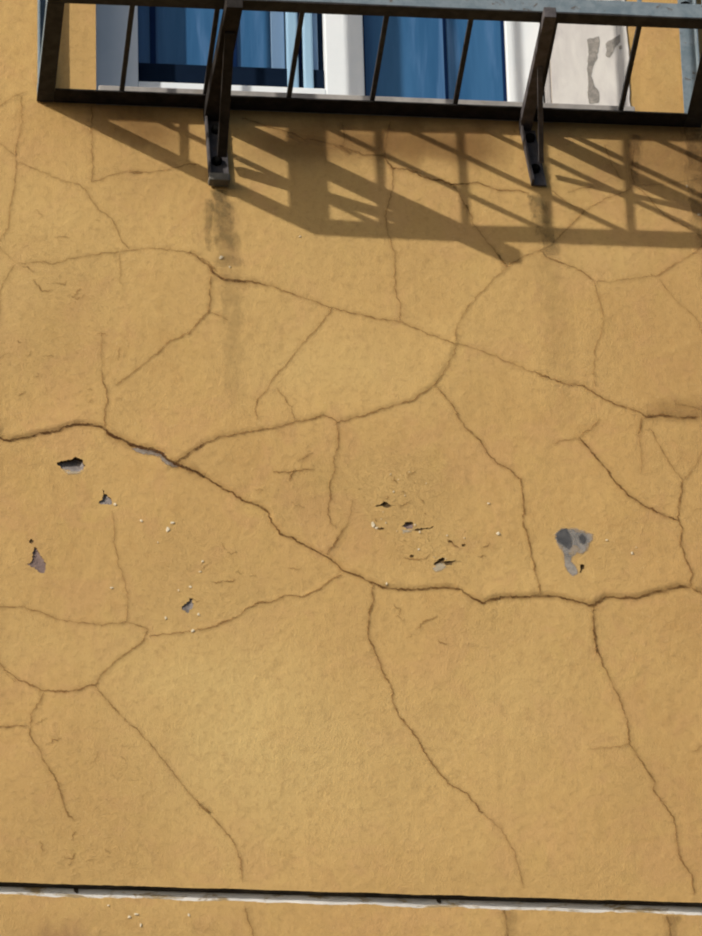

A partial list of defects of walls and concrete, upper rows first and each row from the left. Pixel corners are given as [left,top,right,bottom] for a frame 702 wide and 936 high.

peeling [587,35,622,104]
crack [254,121,525,193]
spalling [57,457,85,472]
spalling [99,489,116,506]
spalling [396,522,433,533]
spalling [27,539,46,573]
spalling [408,548,461,566]
spalling [555,528,592,576]
crack [0,261,702,891]
spalling [178,586,200,616]